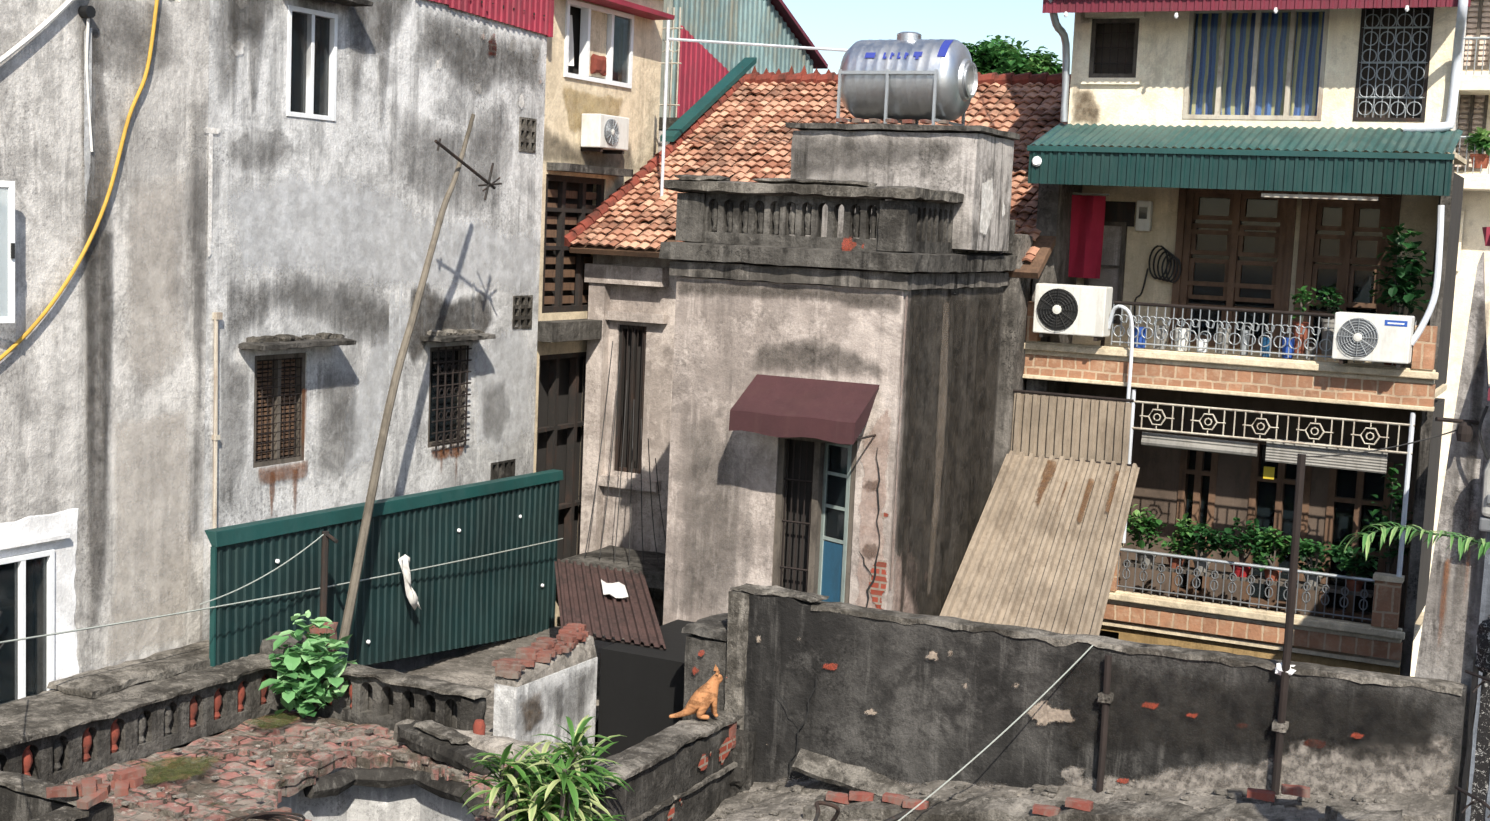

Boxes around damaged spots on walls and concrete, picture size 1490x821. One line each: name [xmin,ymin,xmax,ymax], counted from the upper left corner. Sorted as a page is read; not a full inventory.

leakage [425,22,538,84]
leakage [84,36,109,595]
corrosion [259,464,307,505]
crack [859,447,880,607]
peeling [856,410,928,614]
corrosion [1035,460,1067,504]
corrosion [1077,471,1120,522]
leakage [1065,663,1433,760]